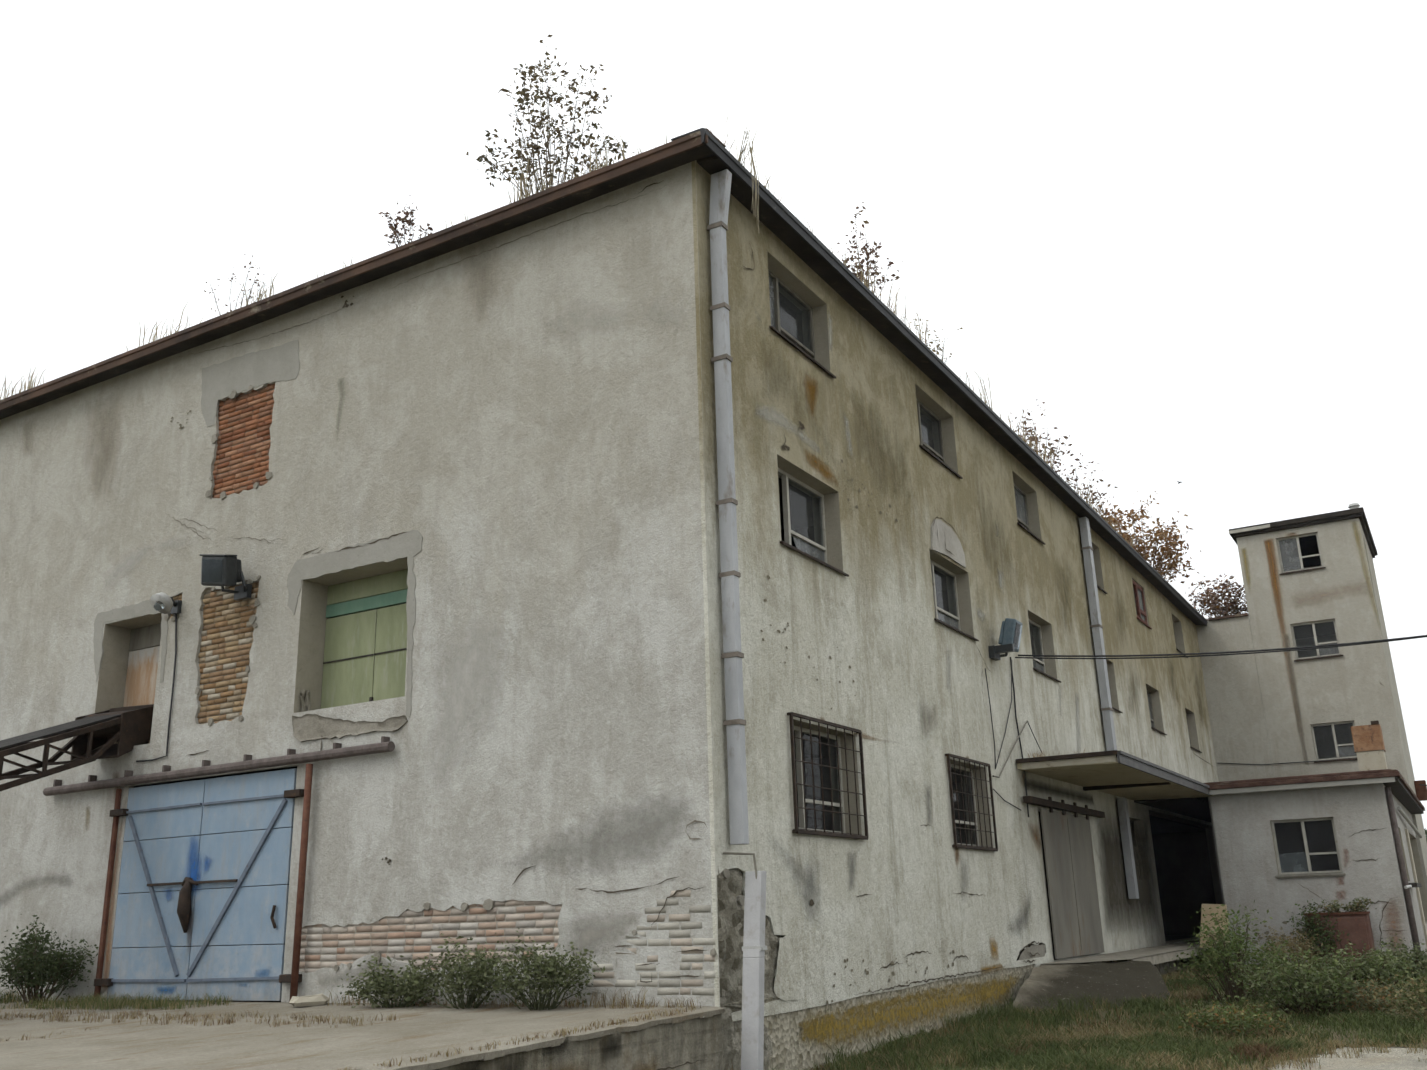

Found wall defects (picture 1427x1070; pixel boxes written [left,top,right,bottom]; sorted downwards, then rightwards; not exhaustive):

flaking render [205,383,275,500]
rust [1266,541,1284,631]
flaking render [195,575,261,726]
crack [685,820,708,840]
flaking render [299,898,562,973]
crack [578,877,706,983]
flaking render [587,868,745,1012]
flaking render [764,916,810,1001]
damp [544,1038,567,1053]